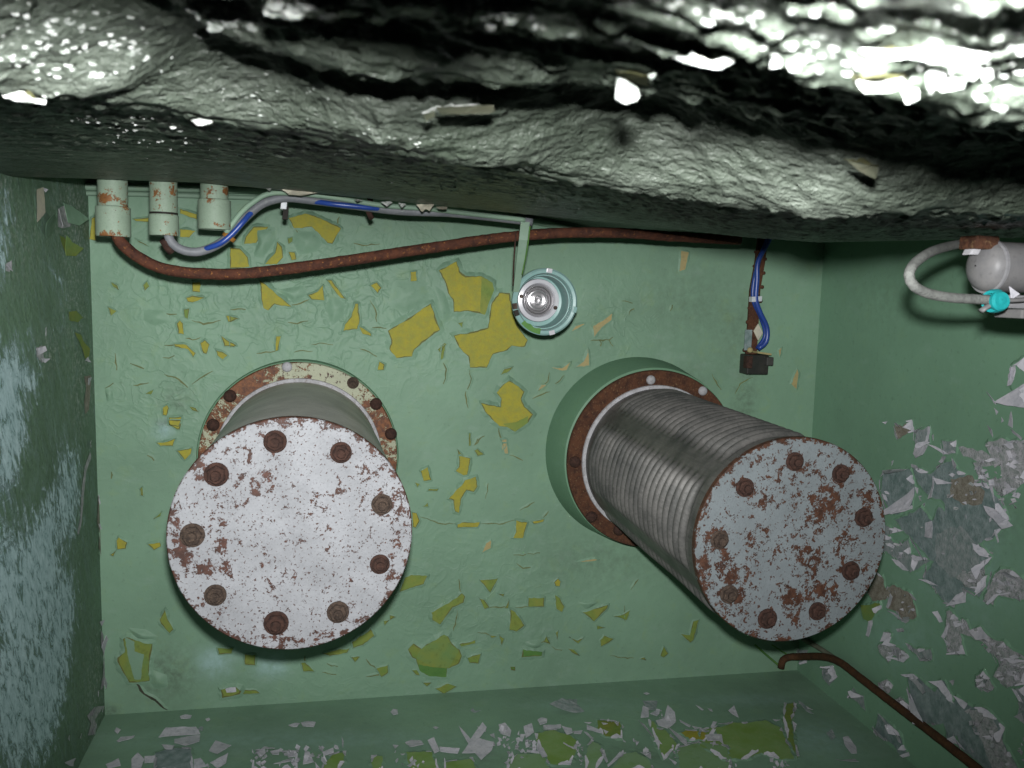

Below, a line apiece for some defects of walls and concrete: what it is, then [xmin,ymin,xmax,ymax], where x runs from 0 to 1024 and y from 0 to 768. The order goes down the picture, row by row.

peeling [227,210,343,313]
peeling [173,280,238,361]
peeling [307,257,541,455]
peeling [411,432,485,529]
peeling [397,572,430,593]
peeling [860,355,1024,768]
peeling [404,577,566,693]
peeling [581,603,631,647]
peeling [106,714,231,768]
peeling [250,739,349,768]
peeling [368,692,814,768]
peeling [847,685,910,758]